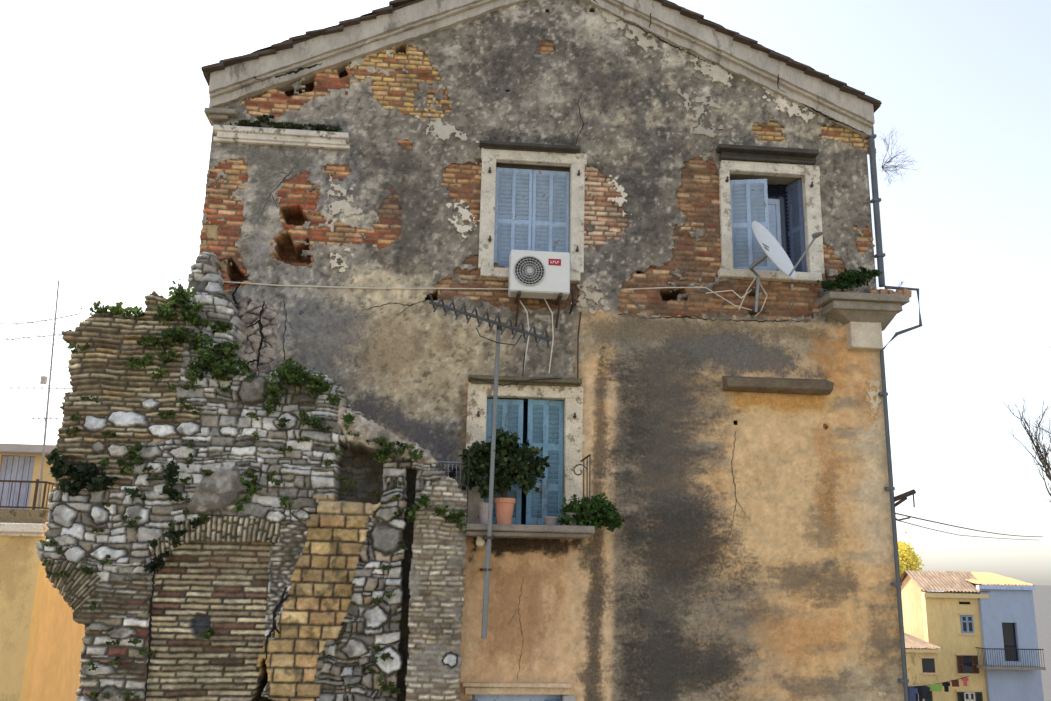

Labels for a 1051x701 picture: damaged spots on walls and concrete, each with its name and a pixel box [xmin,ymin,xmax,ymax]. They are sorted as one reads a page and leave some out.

flaking render [242,44,479,143]
flaking render [199,158,251,293]
flaking render [269,163,403,272]
flaking render [427,156,854,322]
flaking render [853,225,875,255]
crack [229,274,293,376]
damp [468,375,582,387]
damp [590,316,827,701]
crack [730,432,746,534]
crack [510,576,524,677]
damp [462,527,606,701]